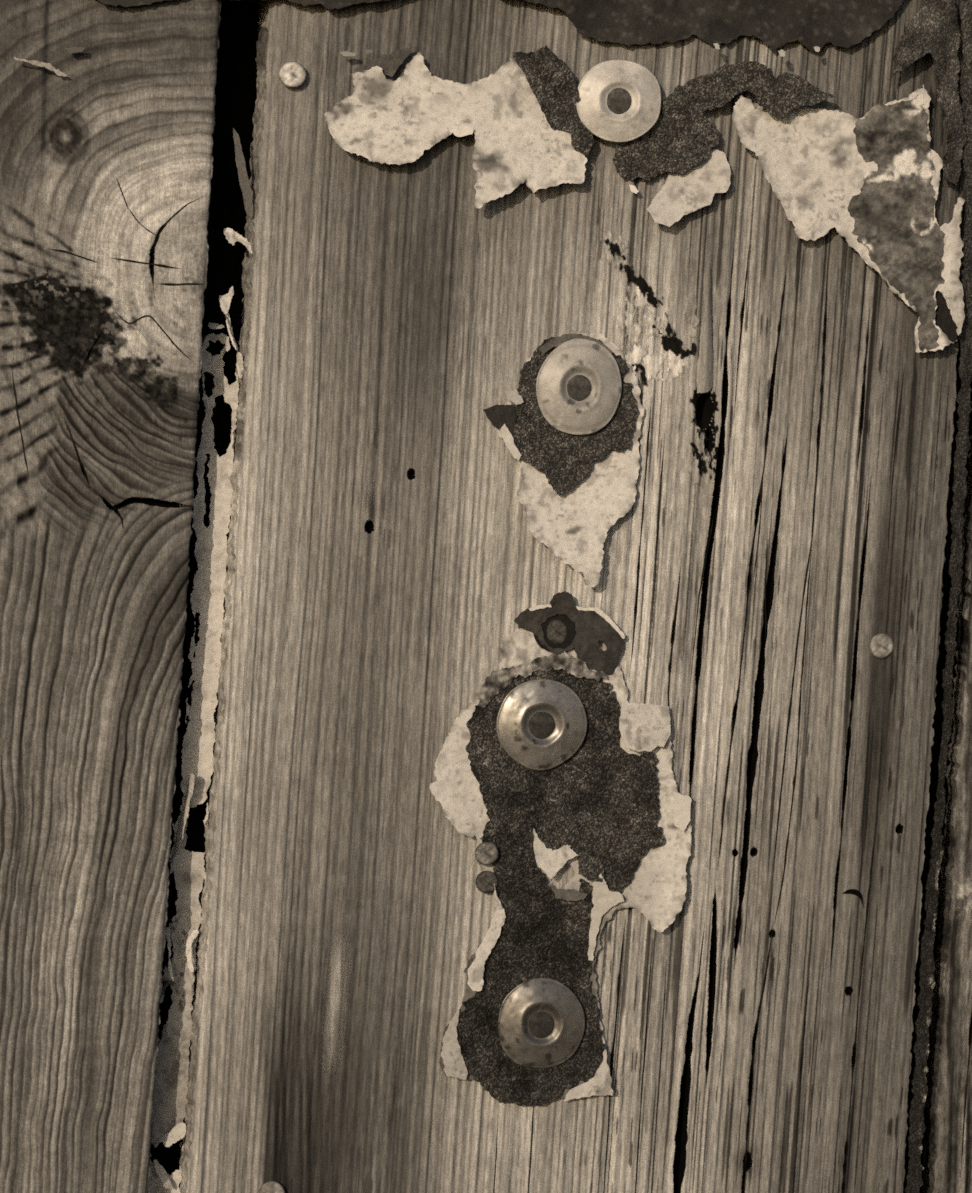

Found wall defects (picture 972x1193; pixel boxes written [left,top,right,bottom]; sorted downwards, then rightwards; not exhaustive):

crack [50,178,205,365]
peeling [603,231,700,386]
crack [64,419,192,527]
crack [629,244,827,1193]
crack [603,925,625,1193]